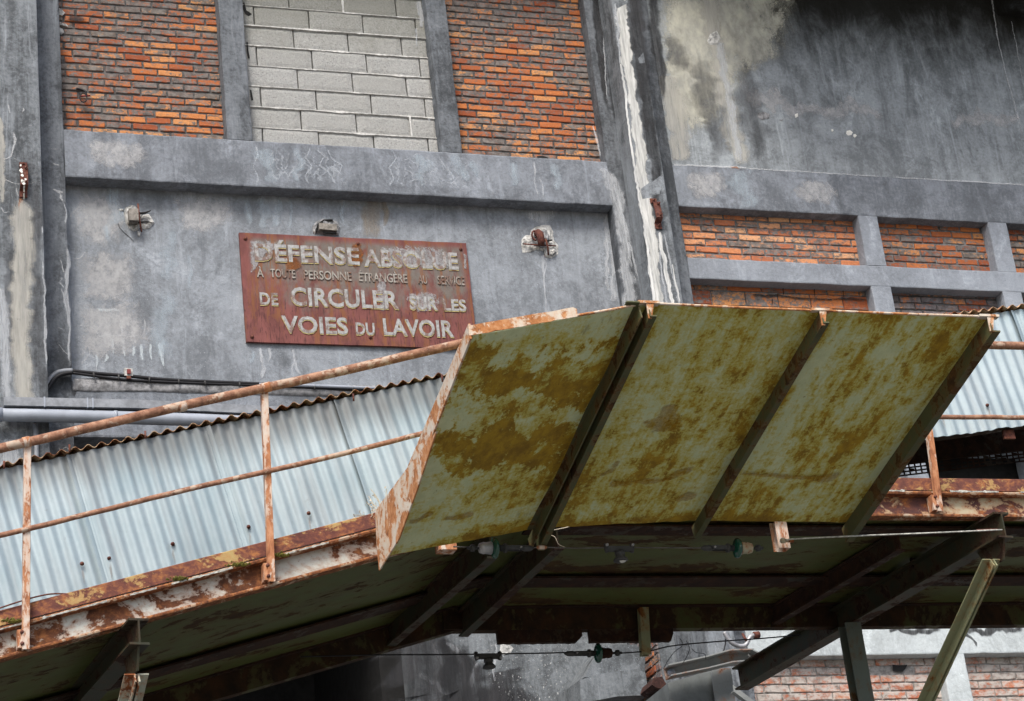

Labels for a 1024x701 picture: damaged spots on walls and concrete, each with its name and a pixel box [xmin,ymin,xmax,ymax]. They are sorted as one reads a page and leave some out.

leakage [0,202,43,397]
spalling [118,205,154,236]
spalling [521,225,558,258]
leakage [593,0,689,303]
leakage [701,0,747,162]